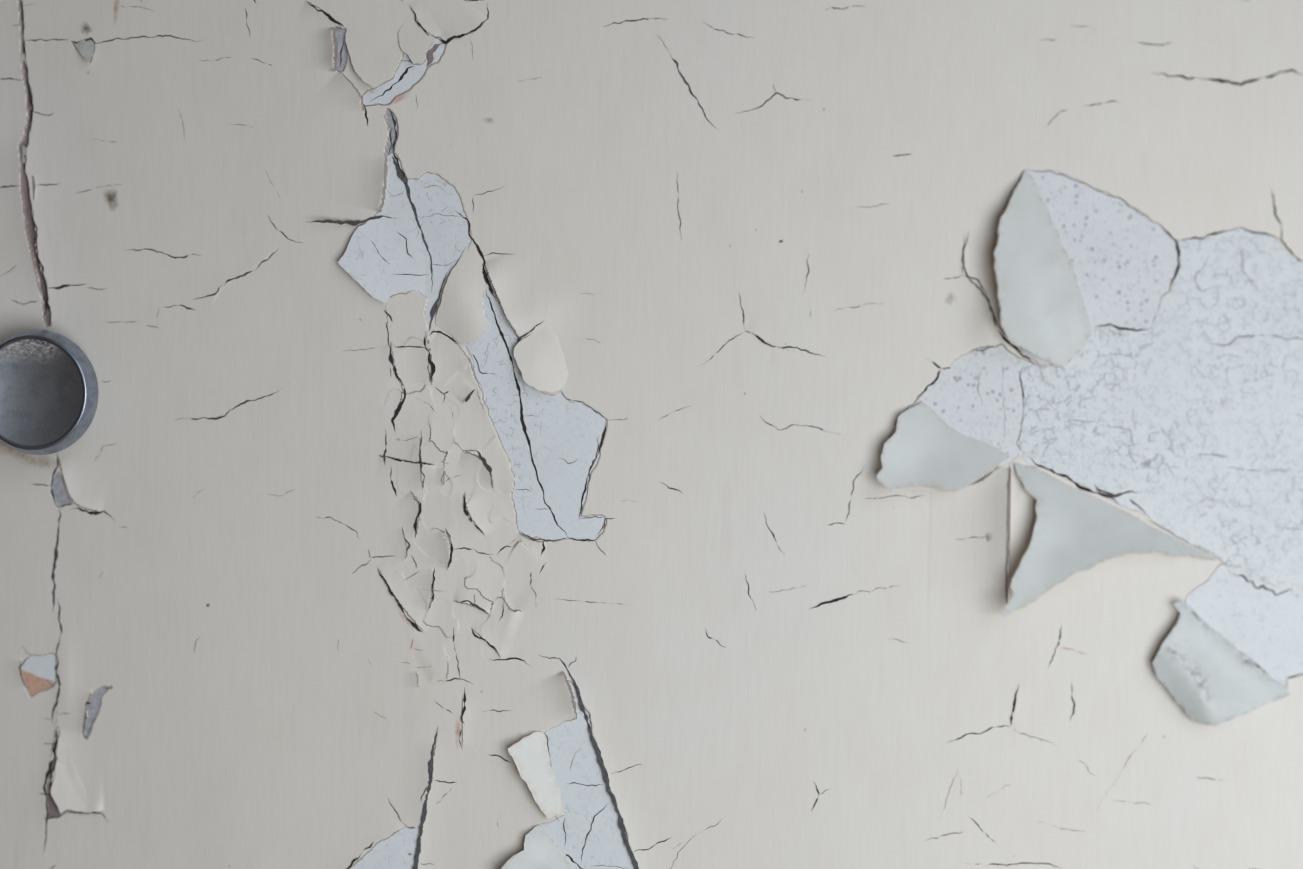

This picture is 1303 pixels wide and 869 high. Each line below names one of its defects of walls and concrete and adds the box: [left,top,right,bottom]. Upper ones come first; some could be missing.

peeling [306,0,489,126]
crack [604,18,808,129]
crack [1135,41,1303,86]
crack [109,172,301,328]
peeling [313,153,625,555]
crack [704,294,824,364]
peeling [877,169,1303,725]
crack [318,307,625,748]
peeling [40,718,111,853]
peeling [346,728,455,869]
peeling [490,655,670,869]
crack [928,627,1150,868]